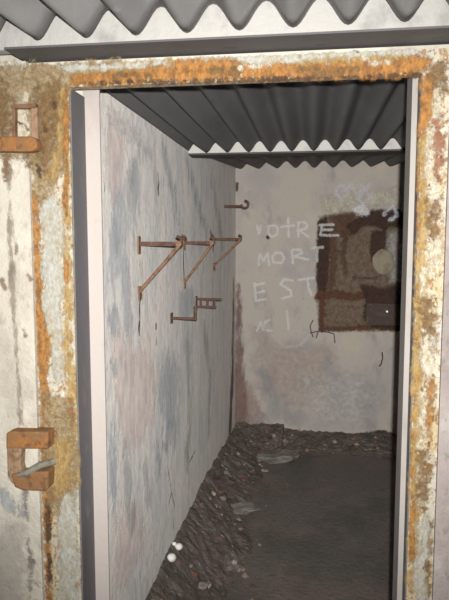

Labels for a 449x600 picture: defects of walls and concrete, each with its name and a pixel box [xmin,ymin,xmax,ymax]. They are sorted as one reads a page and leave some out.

rust [32,190,81,600]
rust [0,53,432,227]
rust [406,61,448,594]